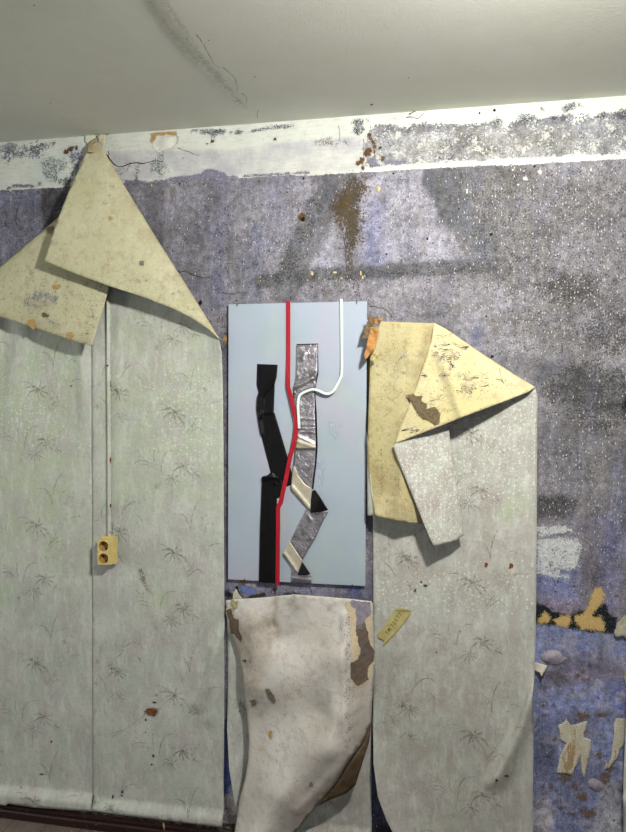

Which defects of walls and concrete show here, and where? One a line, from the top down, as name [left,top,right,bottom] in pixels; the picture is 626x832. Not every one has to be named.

peeling [515,102,584,122]
peeling [2,142,56,158]
flaking render [351,119,411,170]
peeling [58,145,78,188]
peeling [125,168,310,187]
peeling [225,580,300,600]
peeling [536,586,619,635]